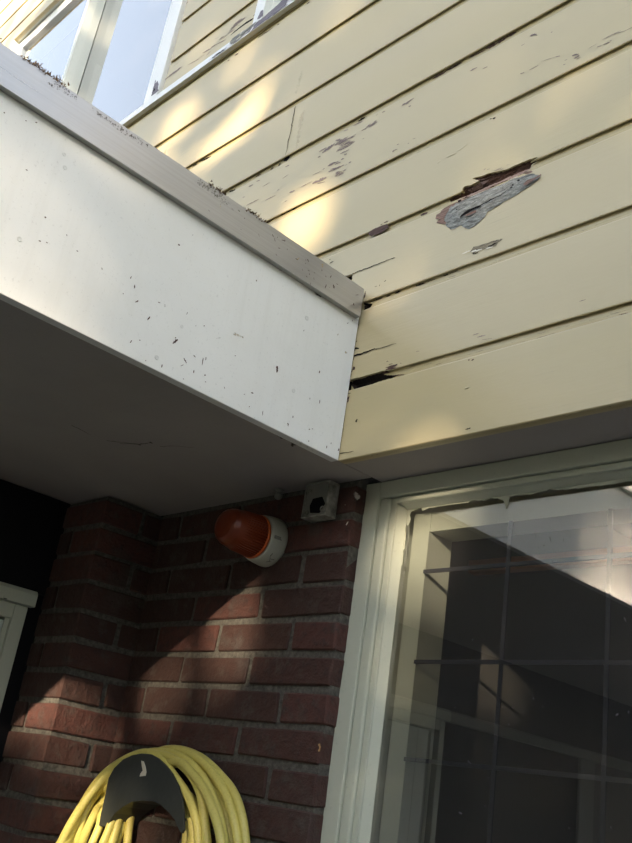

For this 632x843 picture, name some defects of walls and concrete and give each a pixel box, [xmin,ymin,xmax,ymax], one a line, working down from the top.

peeling [151,0,288,96]
peeling [267,117,377,223]
spalling [449,158,538,210]
spalling [463,239,502,254]